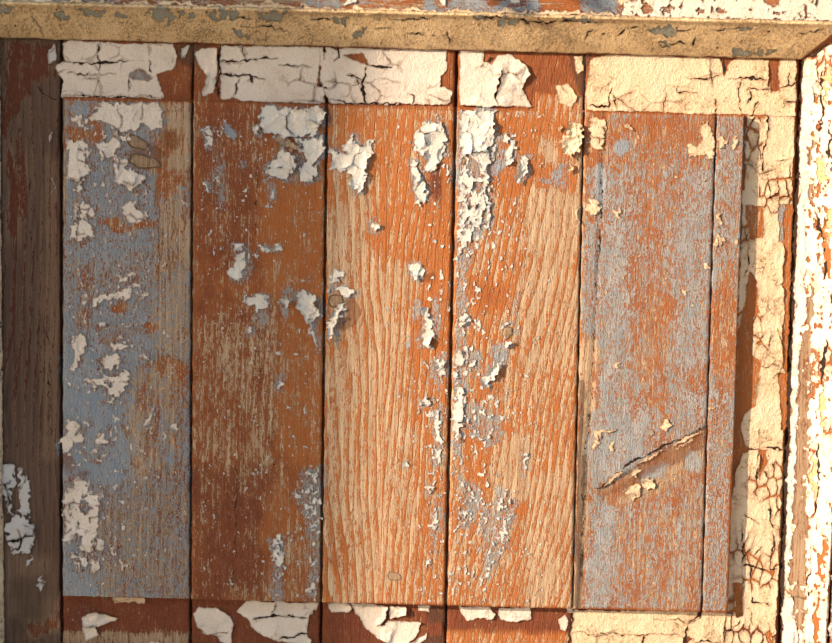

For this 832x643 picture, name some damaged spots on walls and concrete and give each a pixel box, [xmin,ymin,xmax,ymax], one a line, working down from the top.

peeling [0,0,543,643]
crack [215,46,415,106]
crack [482,15,593,38]
crack [567,26,832,643]